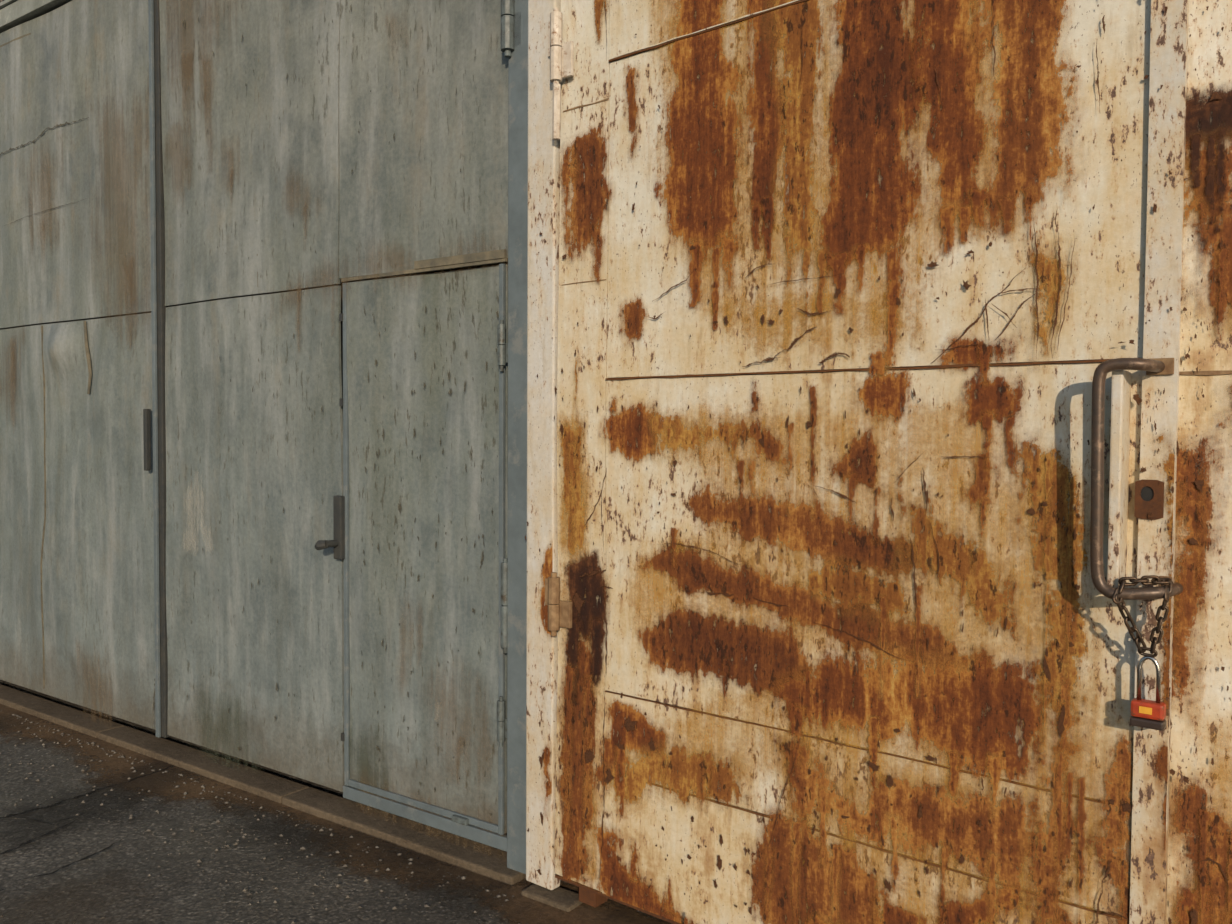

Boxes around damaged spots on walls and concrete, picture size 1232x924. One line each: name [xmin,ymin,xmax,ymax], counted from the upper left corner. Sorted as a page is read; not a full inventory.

corrosion [1183,88,1232,341]
corrosion [540,0,1133,924]
corrosion [1158,435,1223,709]
corrosion [1155,745,1232,924]